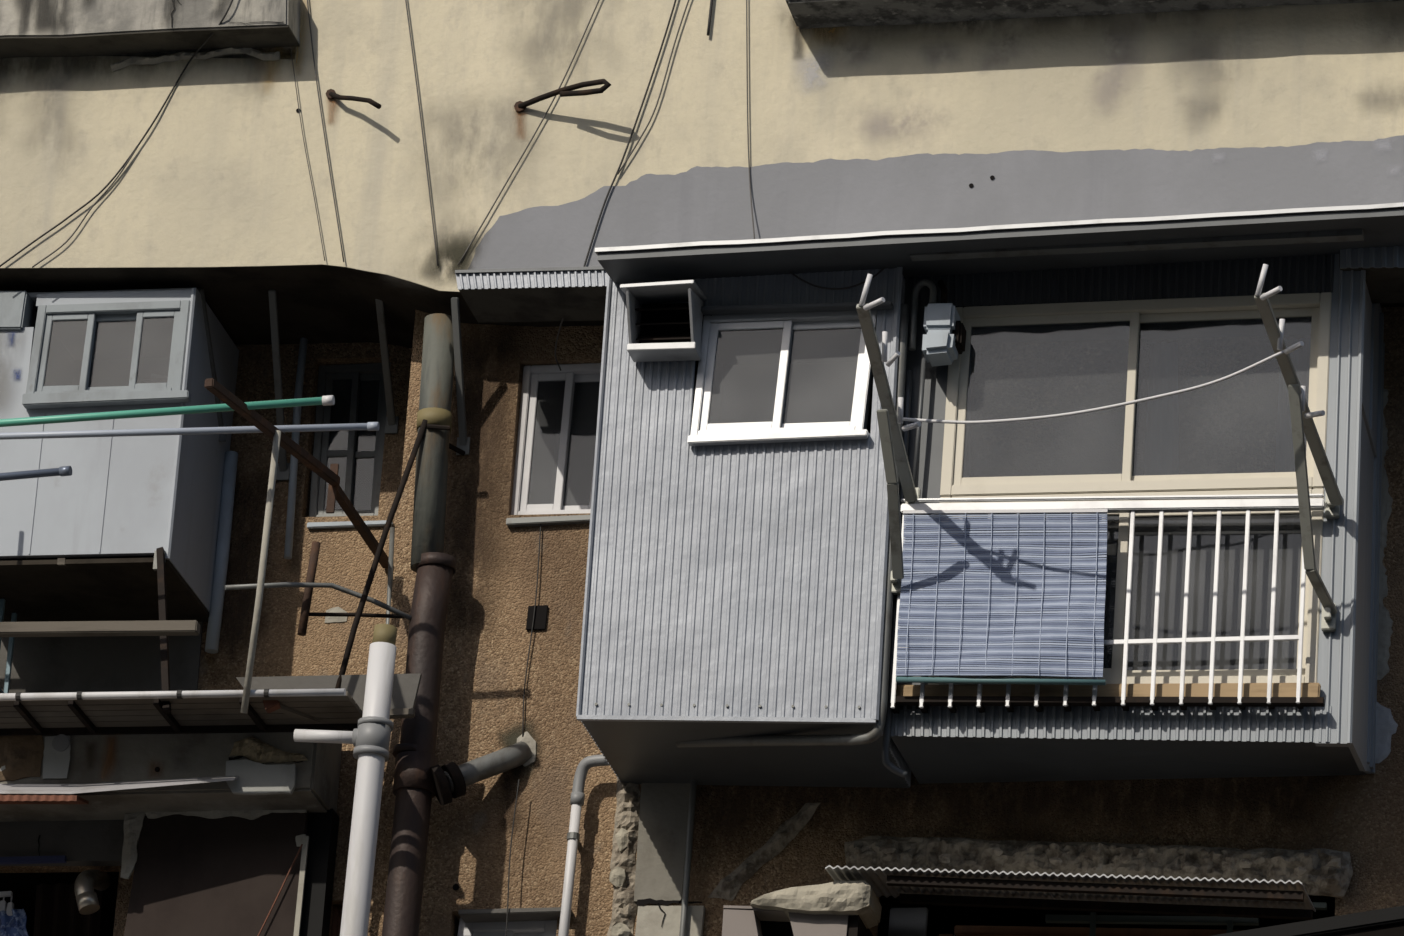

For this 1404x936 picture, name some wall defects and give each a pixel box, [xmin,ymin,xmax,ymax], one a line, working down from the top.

damp [18,0,66,29]
damp [428,240,474,274]
peeling [1375,702,1398,763]
peeling [0,735,44,781]